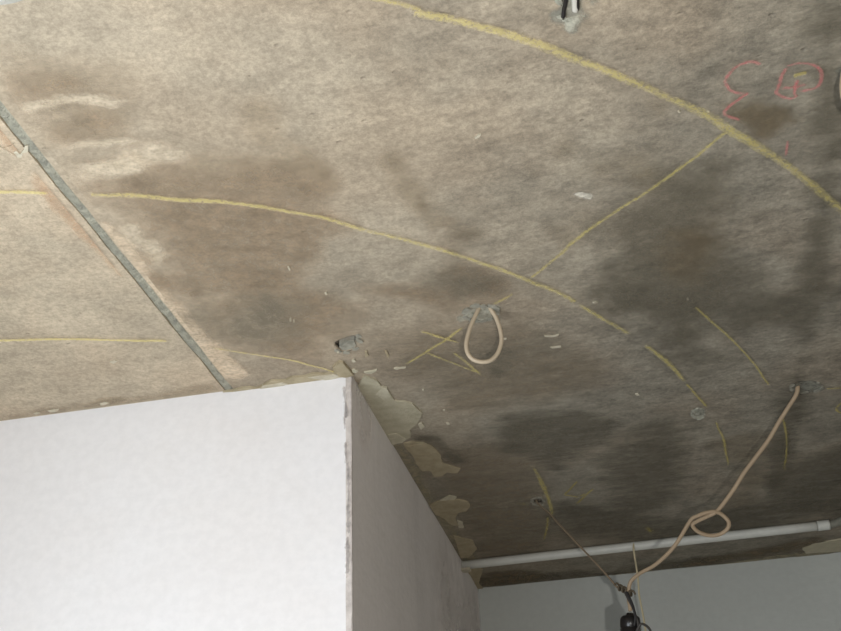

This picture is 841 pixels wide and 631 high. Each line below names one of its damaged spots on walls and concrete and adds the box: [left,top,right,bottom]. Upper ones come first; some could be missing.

water stain [16,72,129,146]
water stain [82,145,349,354]
water stain [595,168,841,359]
water stain [399,331,588,407]
peeling [429,495,477,558]
water stain [416,413,616,556]
water stain [553,393,841,541]